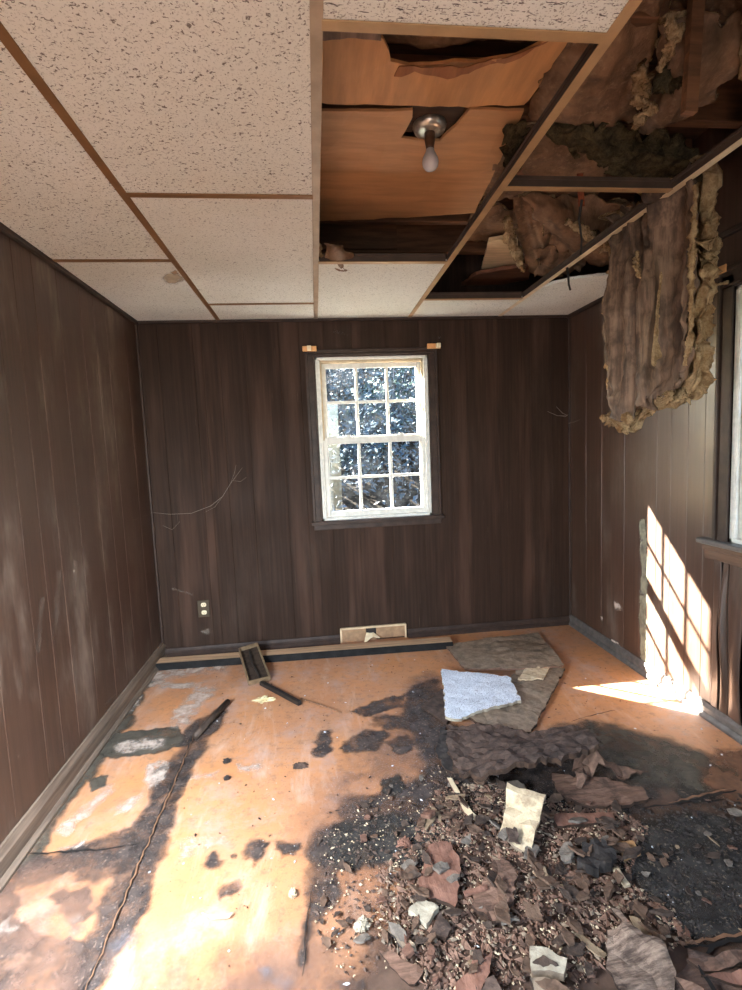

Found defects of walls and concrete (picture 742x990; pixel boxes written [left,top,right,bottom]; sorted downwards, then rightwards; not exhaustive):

peeling [323,31,381,41]
peeling [324,243,354,272]
water stain [0,666,226,990]
water stain [205,679,742,990]